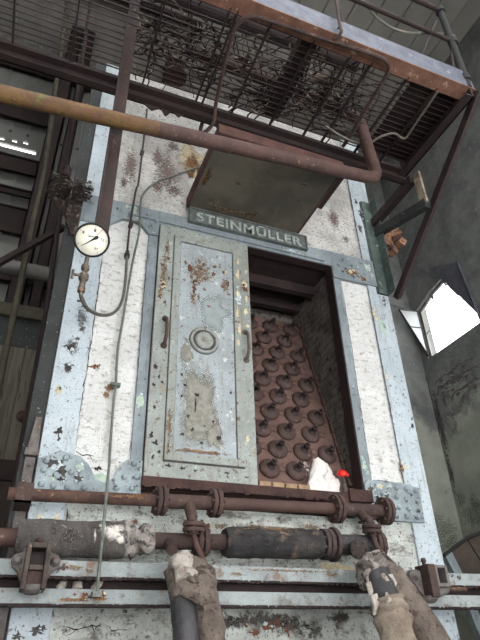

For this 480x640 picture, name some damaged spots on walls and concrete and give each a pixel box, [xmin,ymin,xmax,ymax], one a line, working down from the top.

corrosion [181,153,200,178]
corrosion [158,246,170,304]
corrosion [184,259,231,303]
peeling [202,260,250,345]
peeling [181,372,222,449]
leakage [435,400,448,457]
crack [65,625,129,638]